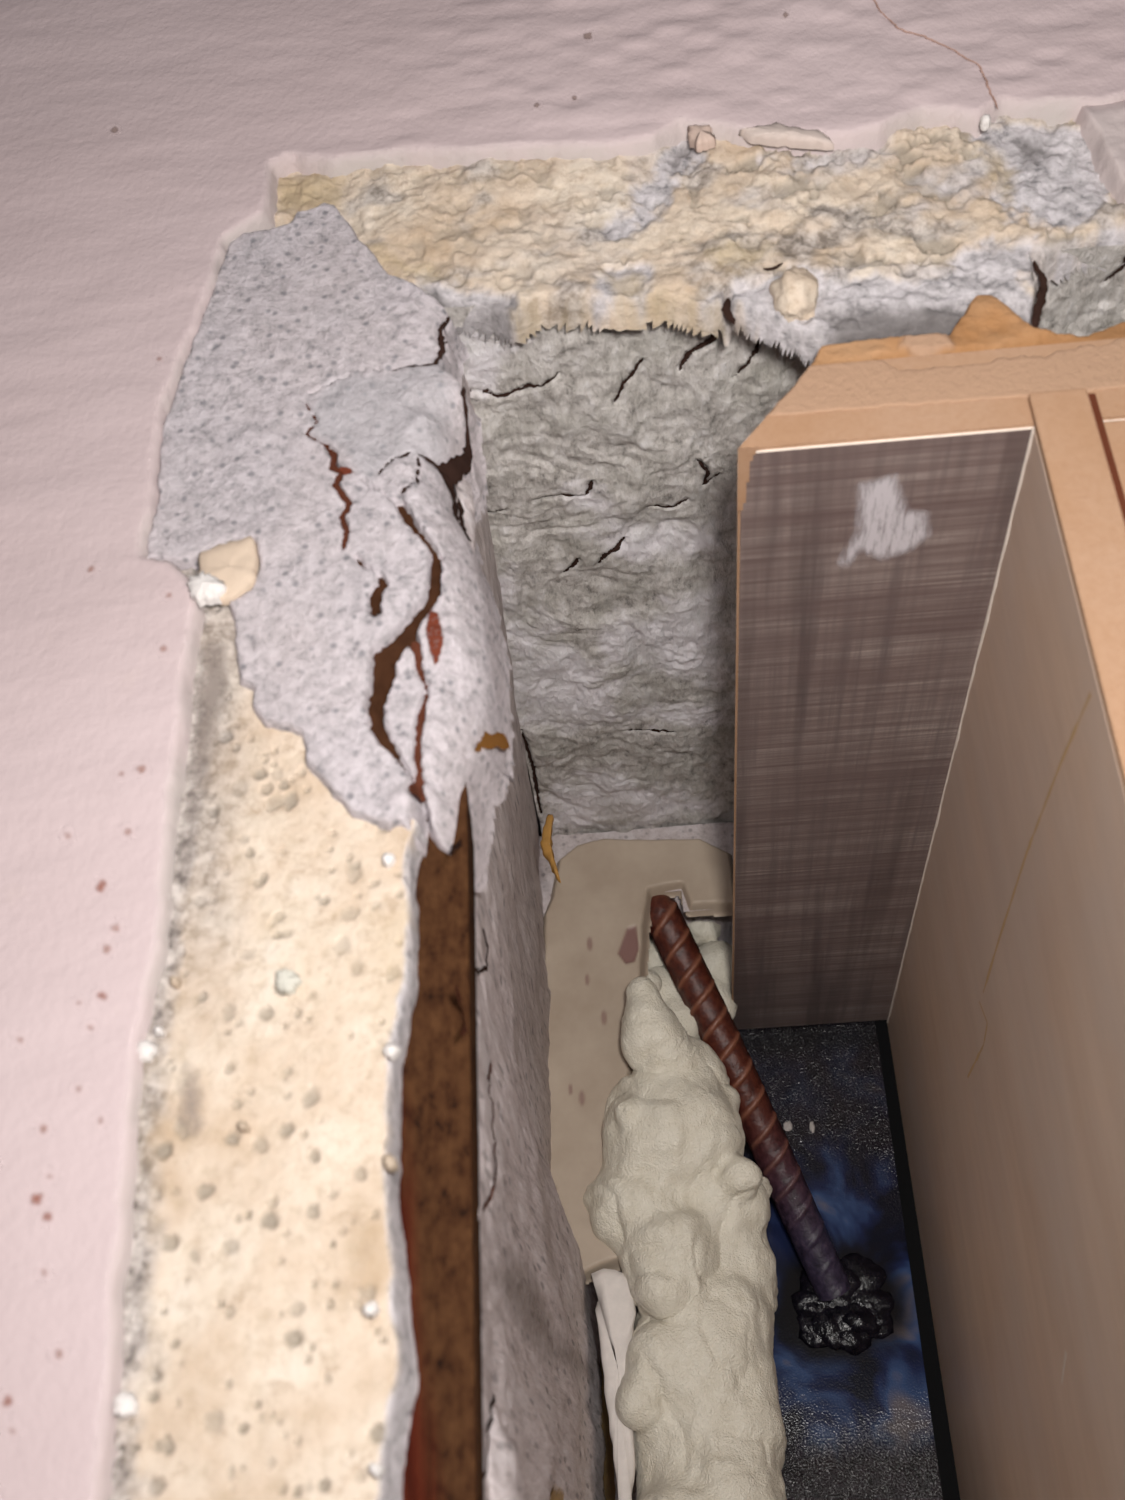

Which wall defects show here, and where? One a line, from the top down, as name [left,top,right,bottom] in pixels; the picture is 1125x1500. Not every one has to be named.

crack [873,0,998,109]
flaking render [274,100,1125,366]
crack [1032,260,1048,328]
crack [1104,256,1125,282]
crack [679,298,760,376]
crack [614,358,643,402]
crack [544,480,593,497]
crack [653,459,720,508]
crack [305,316,558,814]
crack [563,537,625,572]
flaking render [109,203,515,1500]